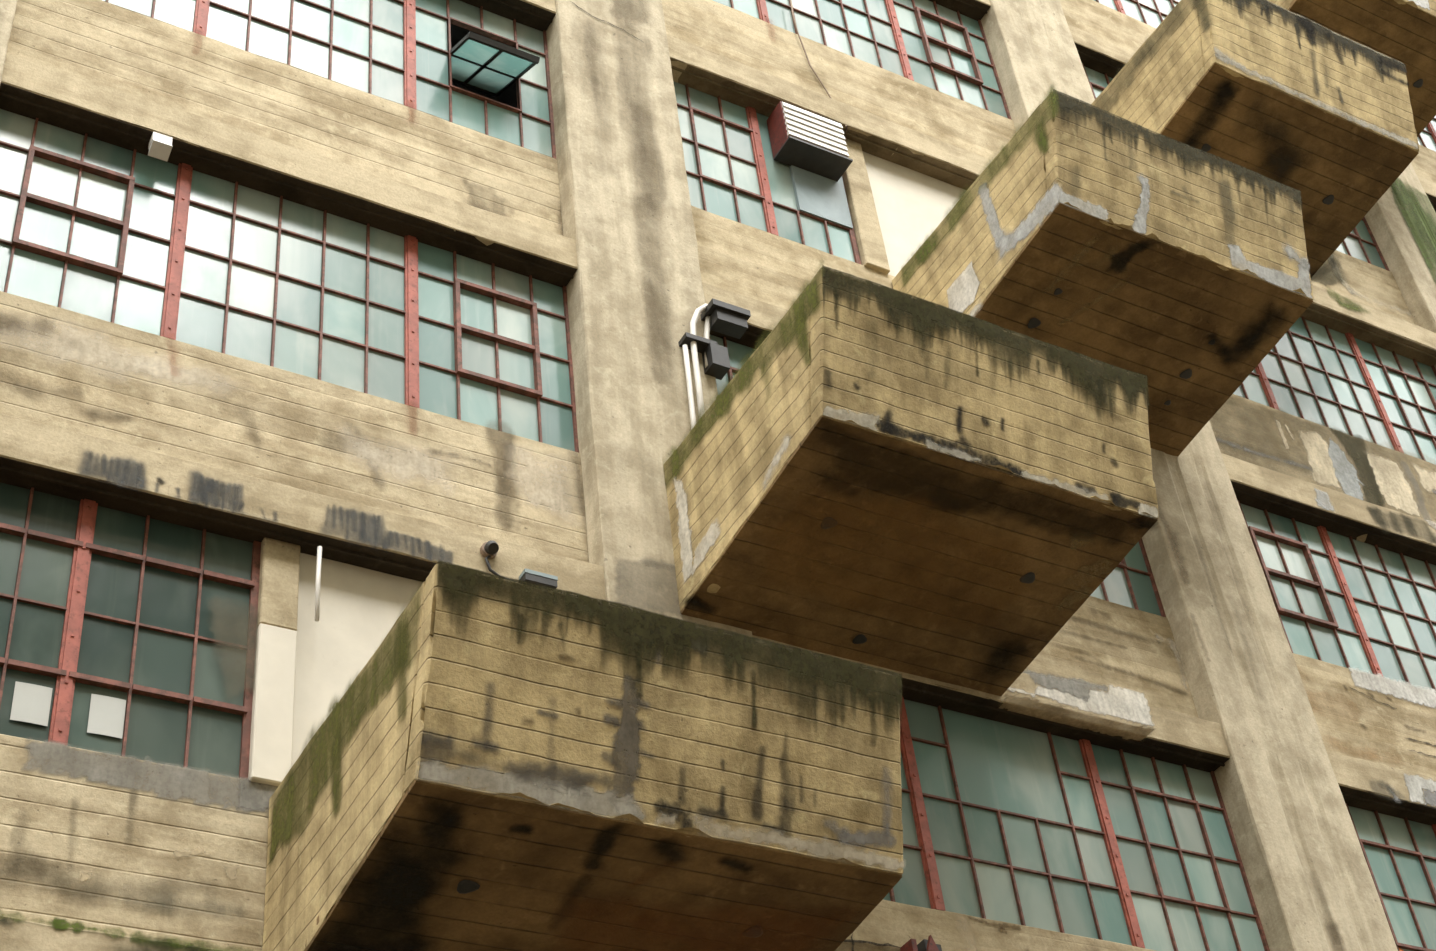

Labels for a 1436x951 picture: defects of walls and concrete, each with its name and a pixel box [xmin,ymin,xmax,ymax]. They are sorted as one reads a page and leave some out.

leakage [1392,184,1436,259]
leakage [655,786,727,828]
leakage [752,748,802,835]